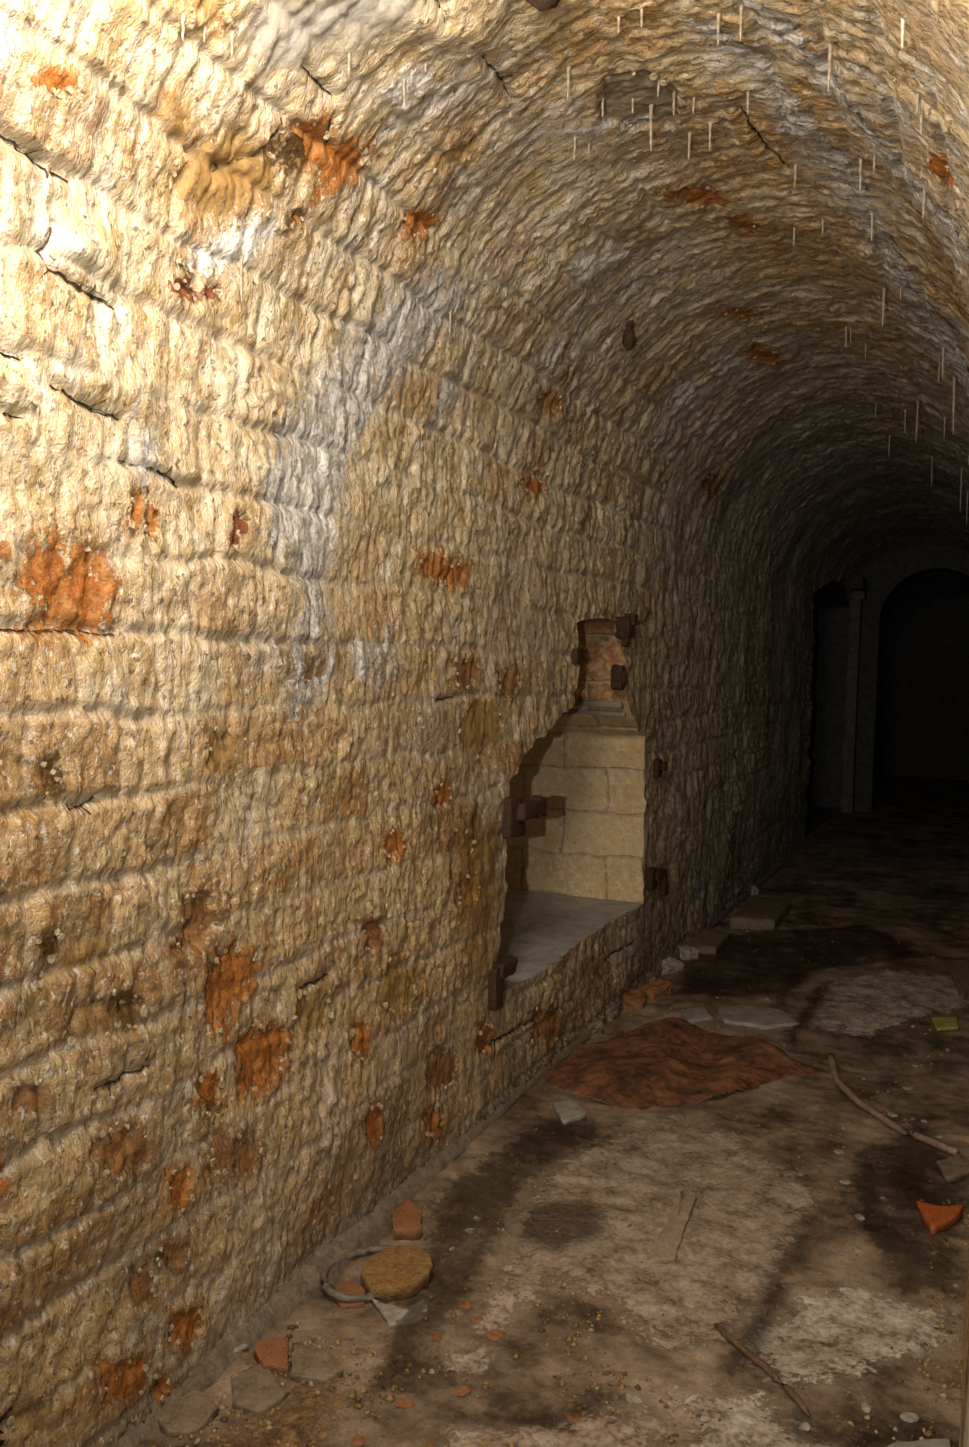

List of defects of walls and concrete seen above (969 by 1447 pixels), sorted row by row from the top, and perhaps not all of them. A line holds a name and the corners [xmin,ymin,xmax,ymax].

crack [0,135,68,182]
crack [740,107,790,168]
crack [35,227,114,310]
crack [49,385,120,420]
water stain [251,254,482,727]
crack [0,1404,14,1447]